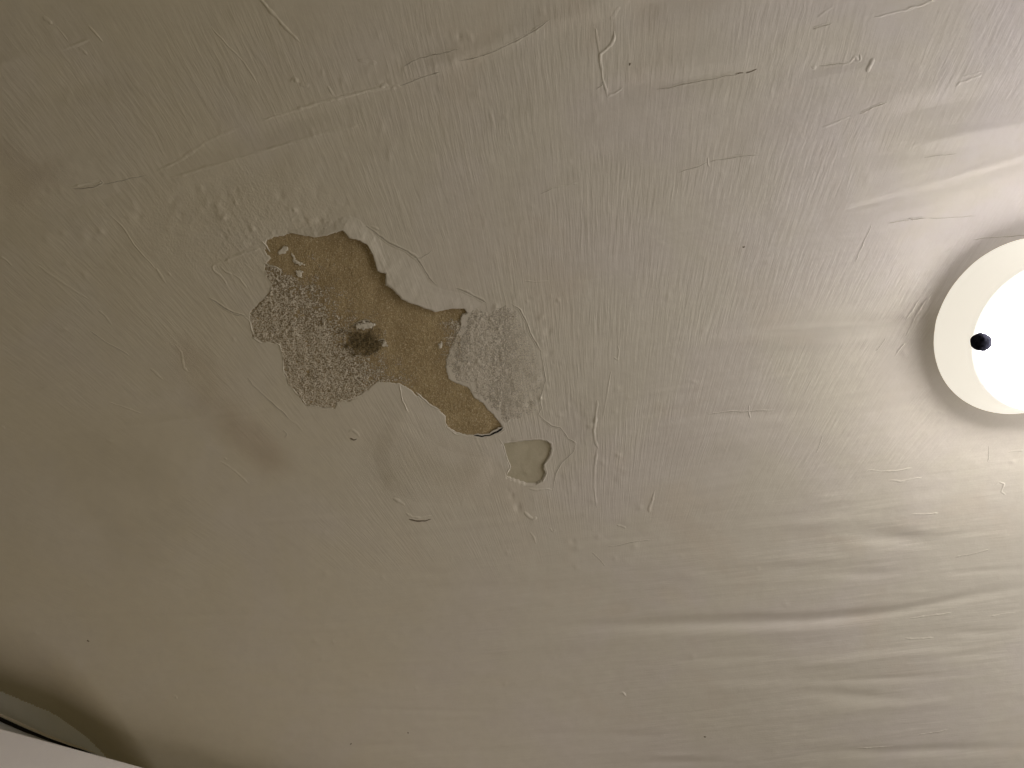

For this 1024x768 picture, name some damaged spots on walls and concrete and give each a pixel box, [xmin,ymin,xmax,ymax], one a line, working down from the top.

peeling [244,215,553,487]